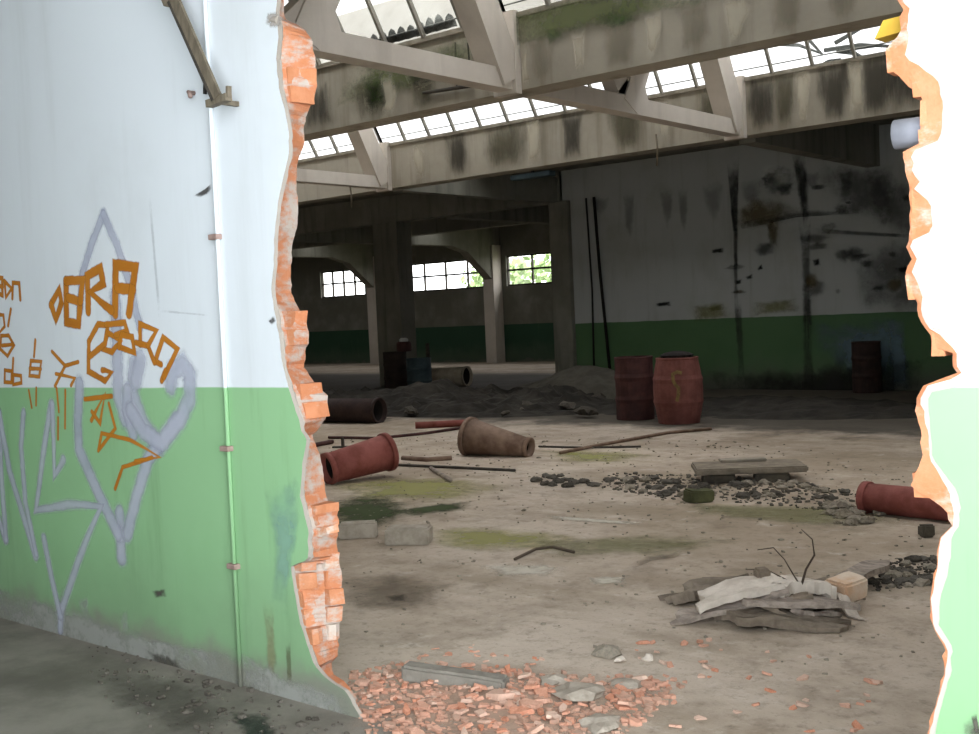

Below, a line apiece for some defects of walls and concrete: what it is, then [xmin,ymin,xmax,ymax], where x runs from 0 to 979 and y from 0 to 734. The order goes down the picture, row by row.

water stain [359,83,395,111]
water stain [701,95,713,114]
water stain [451,137,464,169]
water stain [490,125,538,164]
water stain [563,116,580,155]
water stain [611,115,637,143]
water stain [795,163,807,214]
water stain [729,174,738,288]
spalling [267,0,363,719]
spalling [885,0,979,734]